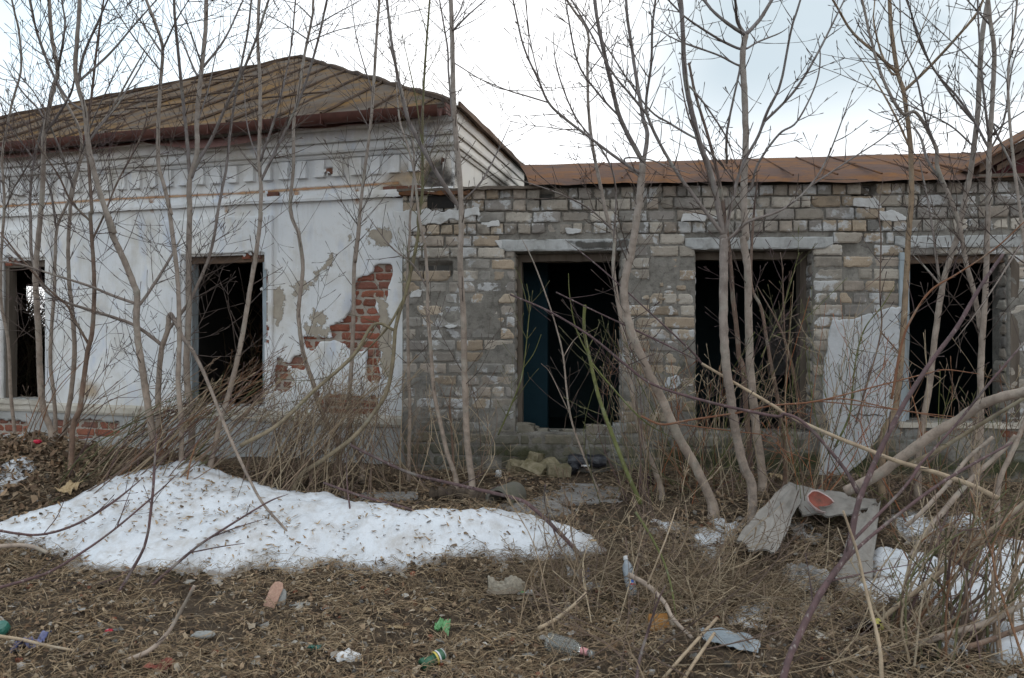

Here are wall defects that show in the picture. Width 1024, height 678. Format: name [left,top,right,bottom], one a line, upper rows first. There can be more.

peeling [365,227,392,247]
peeling [242,251,333,343]
spalling [274,264,393,415]
spalling [0,419,27,435]
spalling [58,419,120,440]